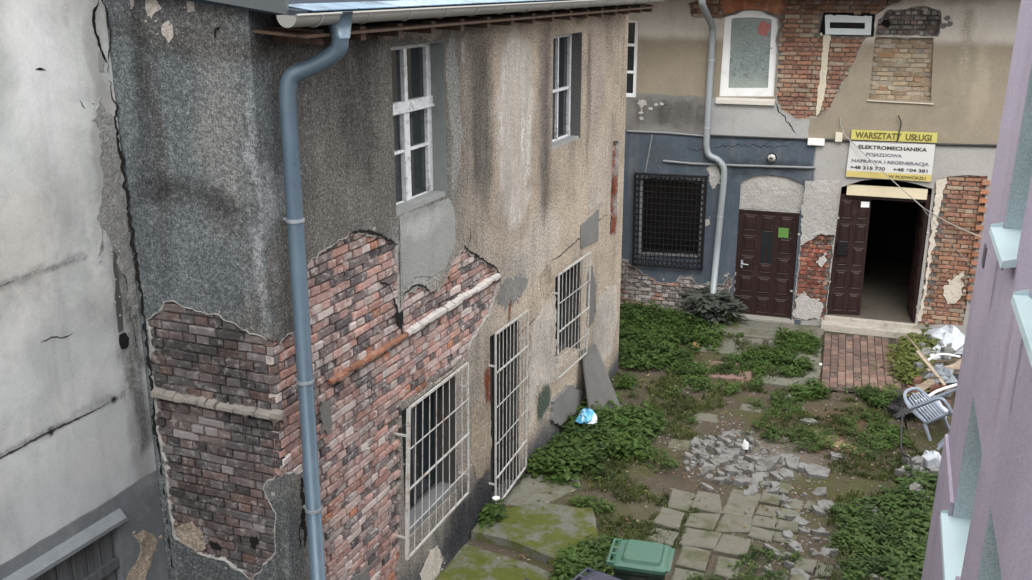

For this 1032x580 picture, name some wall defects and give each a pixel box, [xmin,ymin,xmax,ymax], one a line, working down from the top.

flaking render [129,0,174,43]
water stain [498,36,533,226]
spalling [688,0,953,120]
crack [0,397,116,459]
crack [92,0,174,579]
spalling [92,97,303,580]
spalling [307,227,557,580]
spalling [586,259,738,361]
spalling [790,179,839,321]
spalling [915,175,987,327]